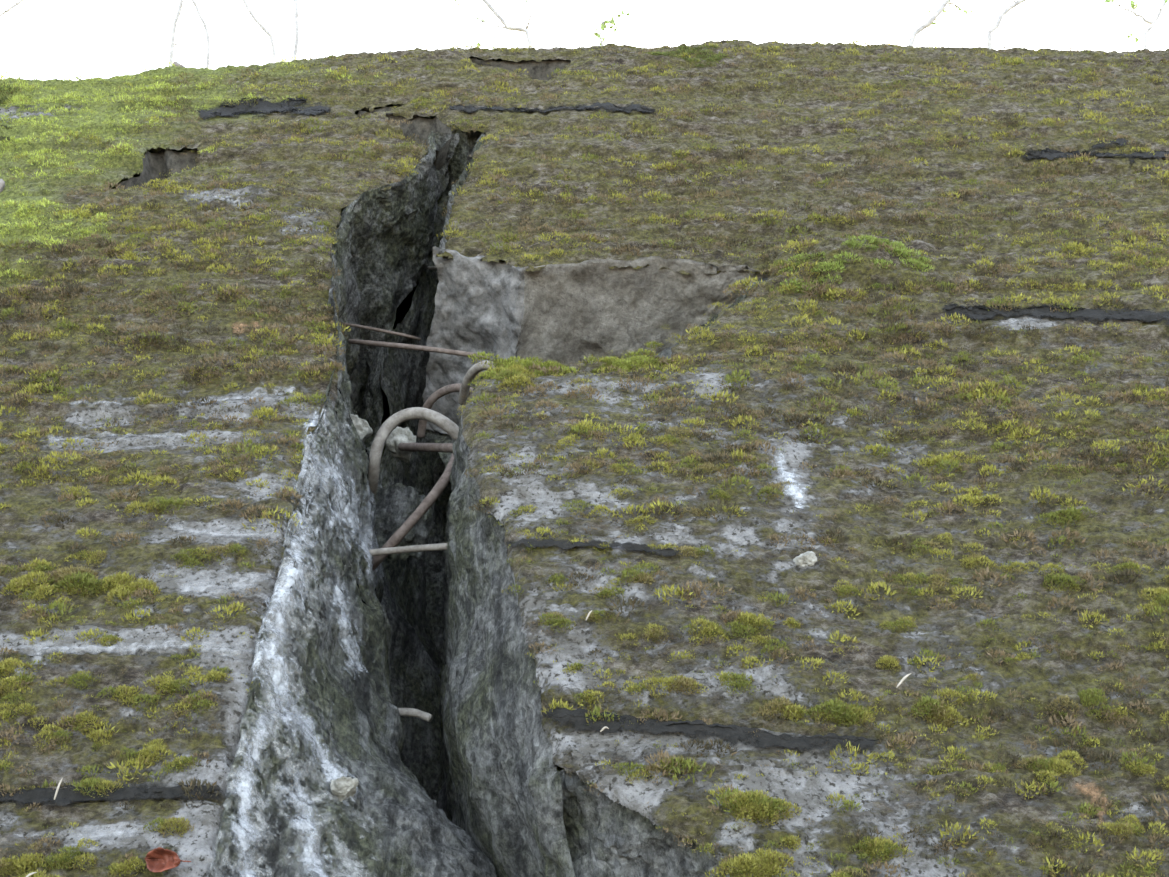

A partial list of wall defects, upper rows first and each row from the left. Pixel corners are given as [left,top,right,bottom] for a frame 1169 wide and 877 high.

spalling [117,148,200,190]
crack [1022,138,1169,168]
spalling [186,191,258,210]
crack [943,303,1169,324]
spalling [423,246,770,469]
crack [0,57,876,877]